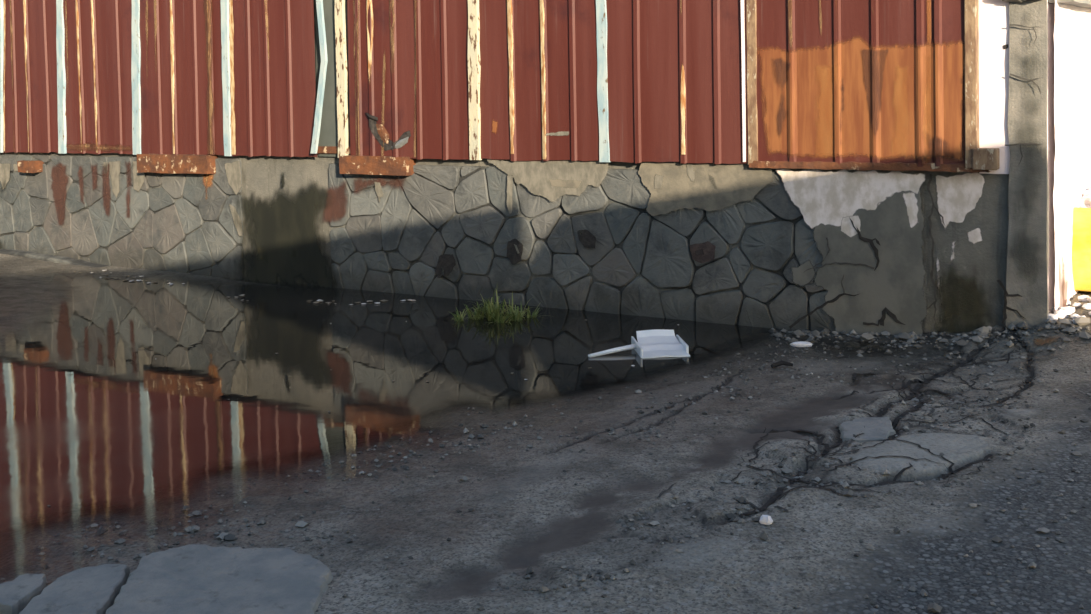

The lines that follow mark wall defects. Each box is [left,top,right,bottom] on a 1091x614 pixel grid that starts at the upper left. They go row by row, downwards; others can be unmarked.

corrosion [204,0,215,154]
corrosion [757,0,965,160]
water stain [241,173,338,288]
flaking render [638,65,985,336]
crack [718,174,1035,524]